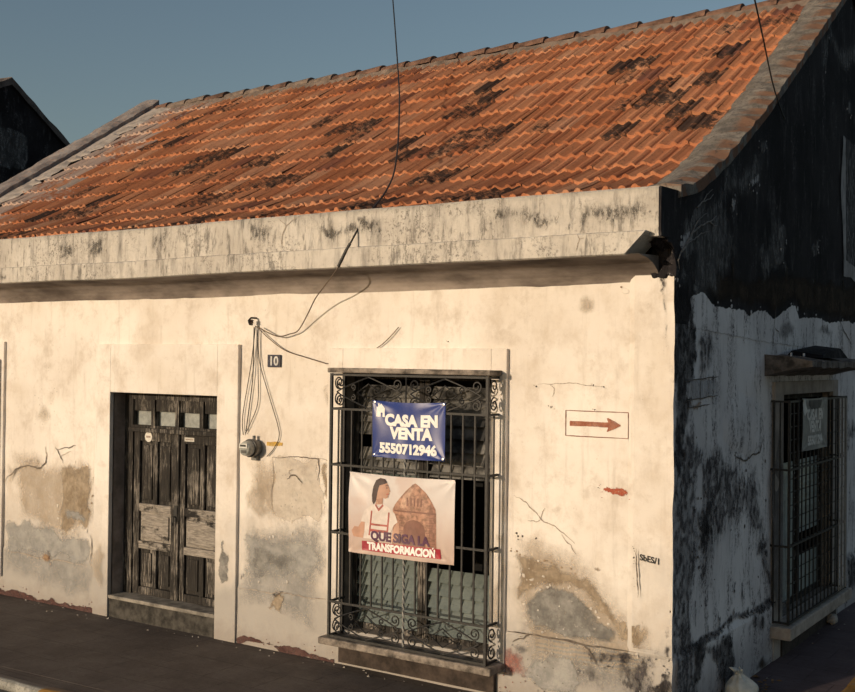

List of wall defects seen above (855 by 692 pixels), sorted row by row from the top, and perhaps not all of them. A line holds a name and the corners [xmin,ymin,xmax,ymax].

water stain [324,216,380,238]
water stain [582,205,639,224]
spalling [649,231,692,287]
peeling [689,292,855,359]
crack [4,445,76,482]
peeling [57,460,94,533]
peeling [272,455,325,535]
crack [517,497,576,554]
water stain [494,251,787,692]
water stain [249,532,322,616]